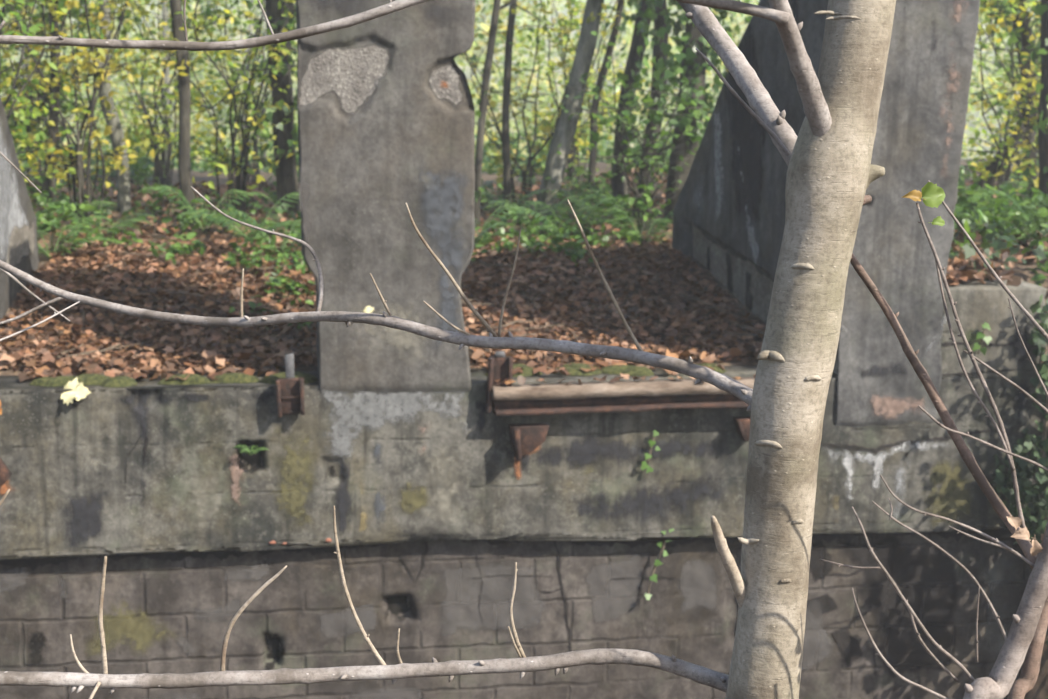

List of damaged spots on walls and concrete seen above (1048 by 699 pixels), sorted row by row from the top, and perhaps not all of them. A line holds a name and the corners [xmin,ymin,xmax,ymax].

spalling [299,45,391,113]
spalling [429,64,463,105]
damp [829,442,937,499]
damp [64,494,103,547]
damp [578,477,720,519]